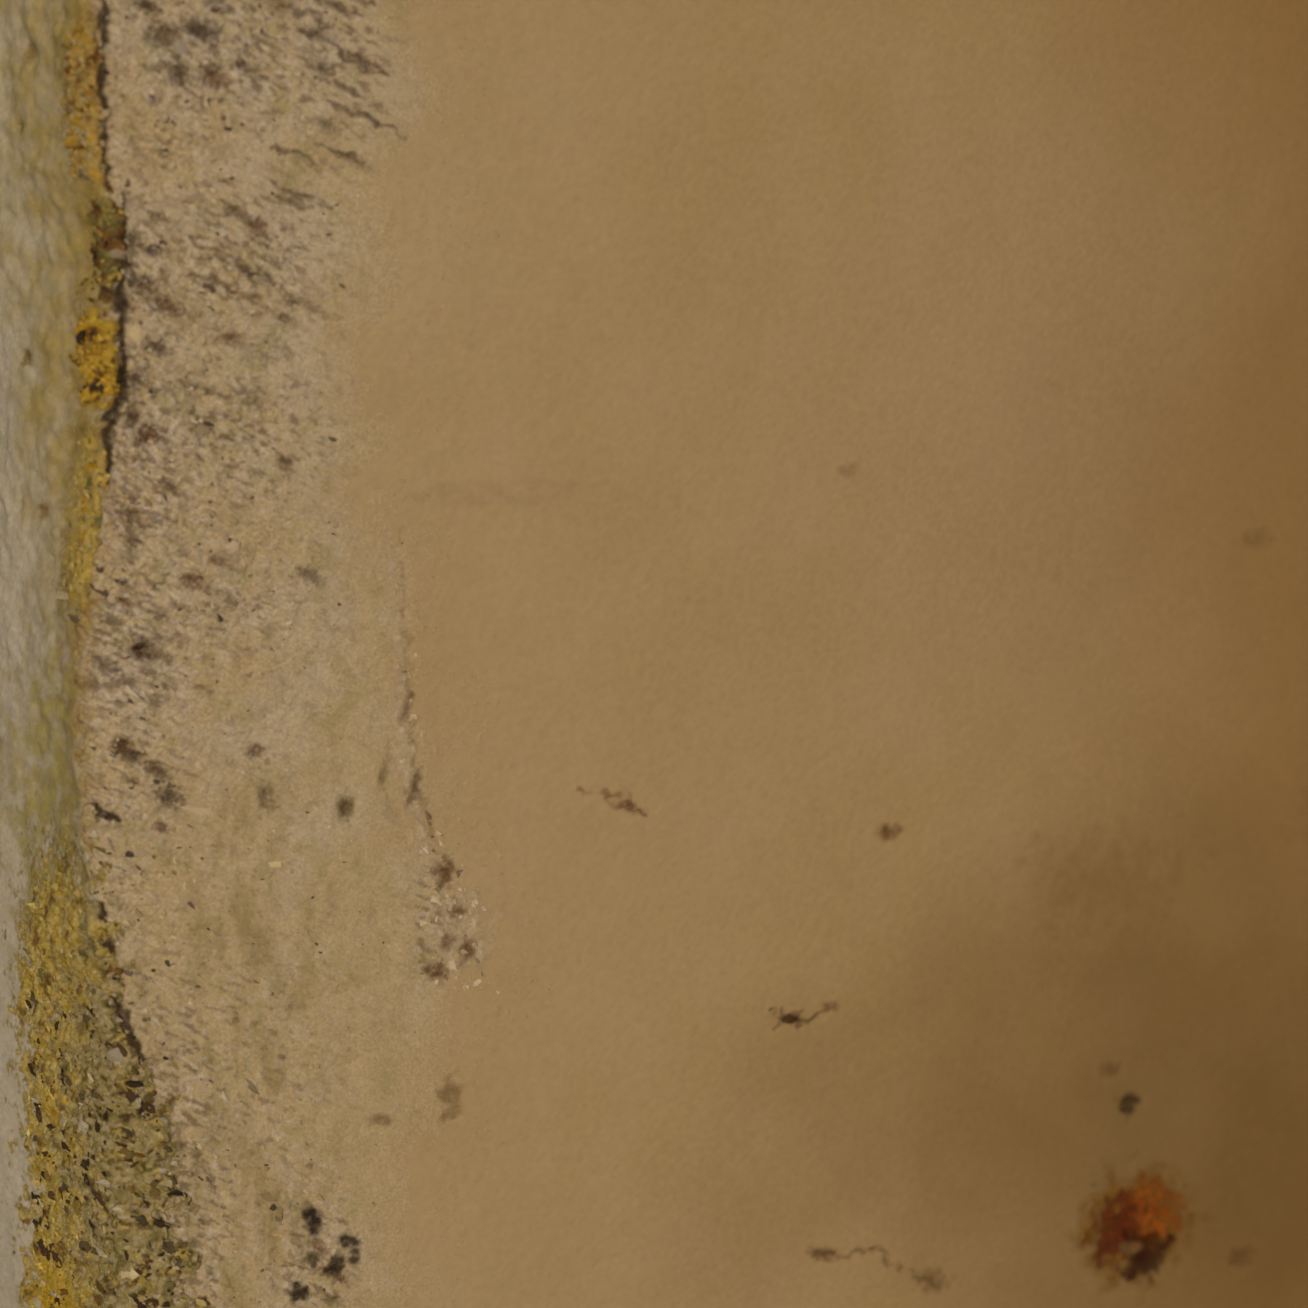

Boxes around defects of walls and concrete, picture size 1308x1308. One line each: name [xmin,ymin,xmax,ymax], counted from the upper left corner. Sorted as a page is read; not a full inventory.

damp [23,297,73,428]
spalling [68,0,554,1308]
corrosion [1081,1172,1184,1281]